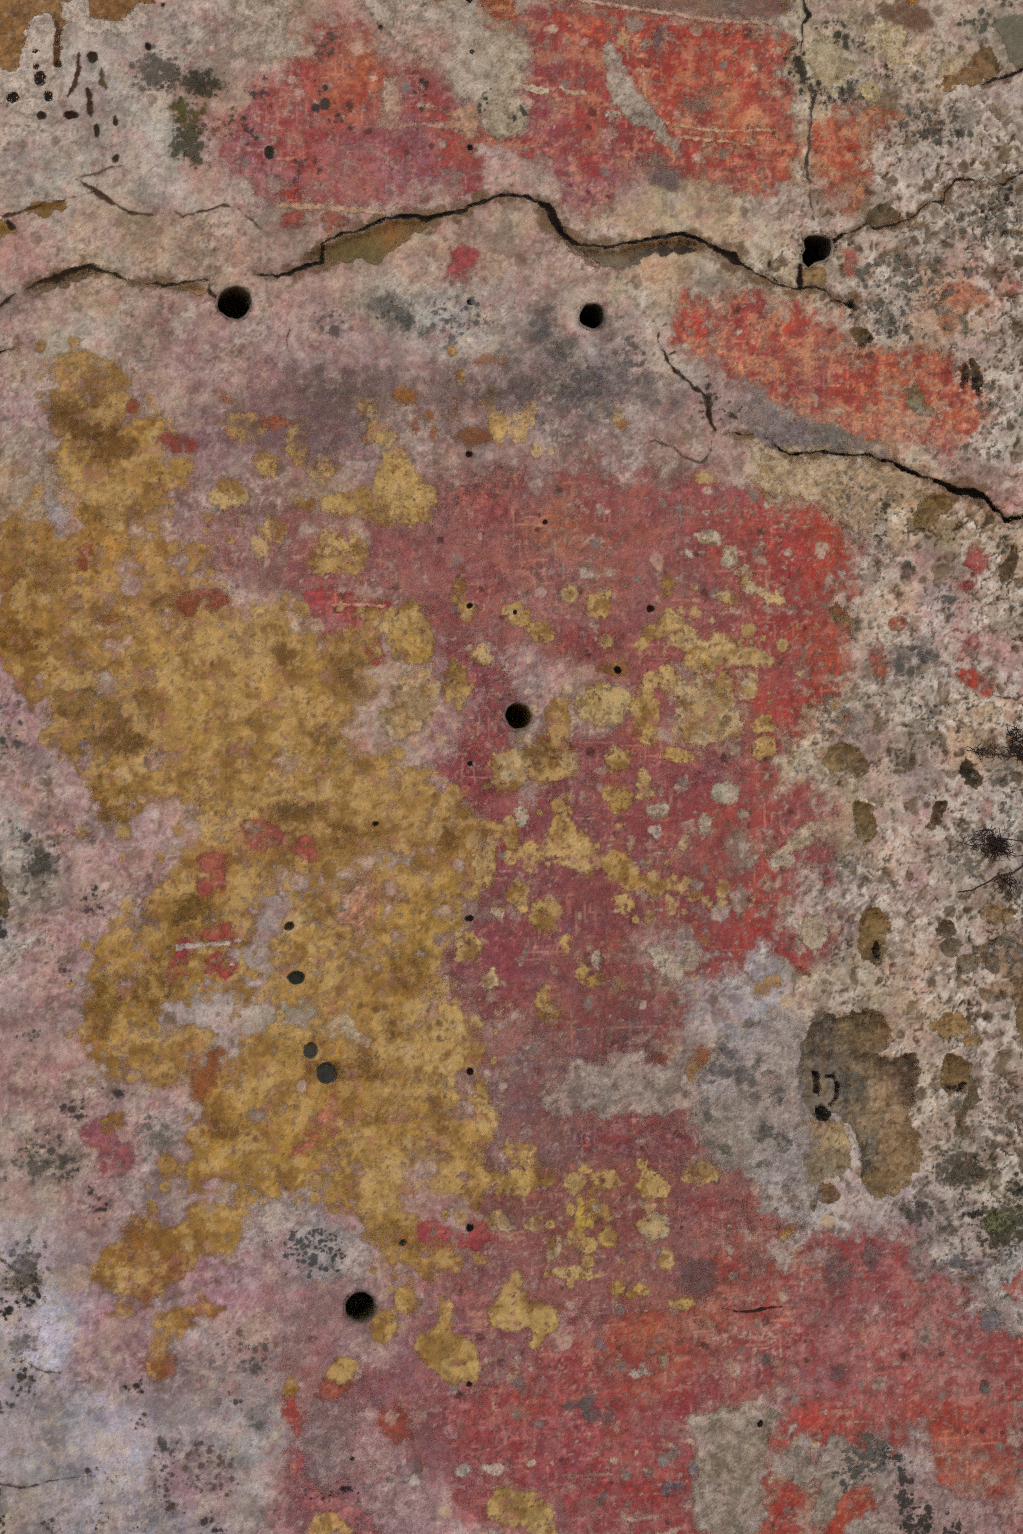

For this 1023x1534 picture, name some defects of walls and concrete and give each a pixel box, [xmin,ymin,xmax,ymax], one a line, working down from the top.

crack [800,0,812,52]
peeling [0,0,165,138]
crack [981,65,1023,90]
crack [0,165,261,237]
crack [255,93,1023,321]
crack [0,255,217,307]
crack [646,323,1023,525]
peeling [766,821,817,869]
spalling [0,869,10,918]
peeling [647,936,708,982]
spalling [929,1012,983,1143]
spalling [481,1006,923,1299]